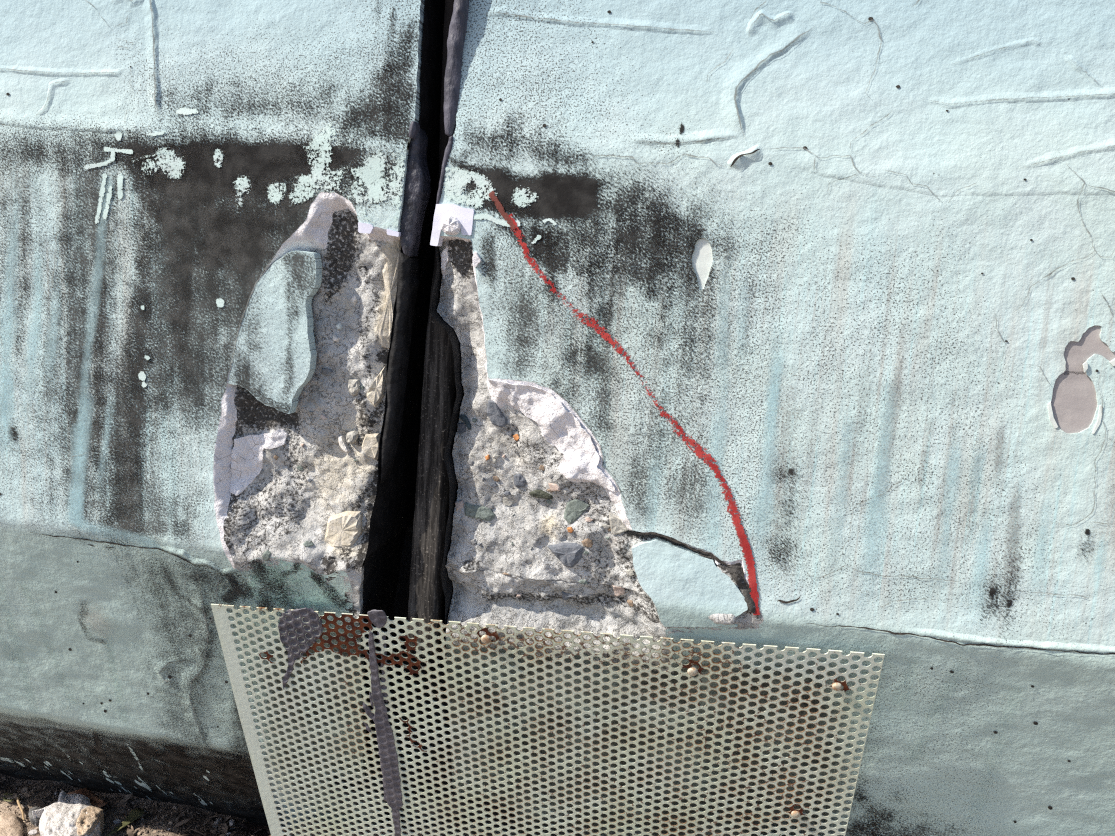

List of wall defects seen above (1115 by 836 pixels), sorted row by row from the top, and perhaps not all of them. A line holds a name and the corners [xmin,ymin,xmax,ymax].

crack [483,12,710,32]
crack [590,1,977,203]
water stain [0,3,419,827]
spalling [213,192,401,629]
spalling [437,236,764,672]
water stain [448,105,760,529]
crack [489,377,1115,655]
crack [996,145,1115,369]
peeling [1048,325,1115,434]
corrosion [300,613,422,675]
water stain [839,774,967,836]